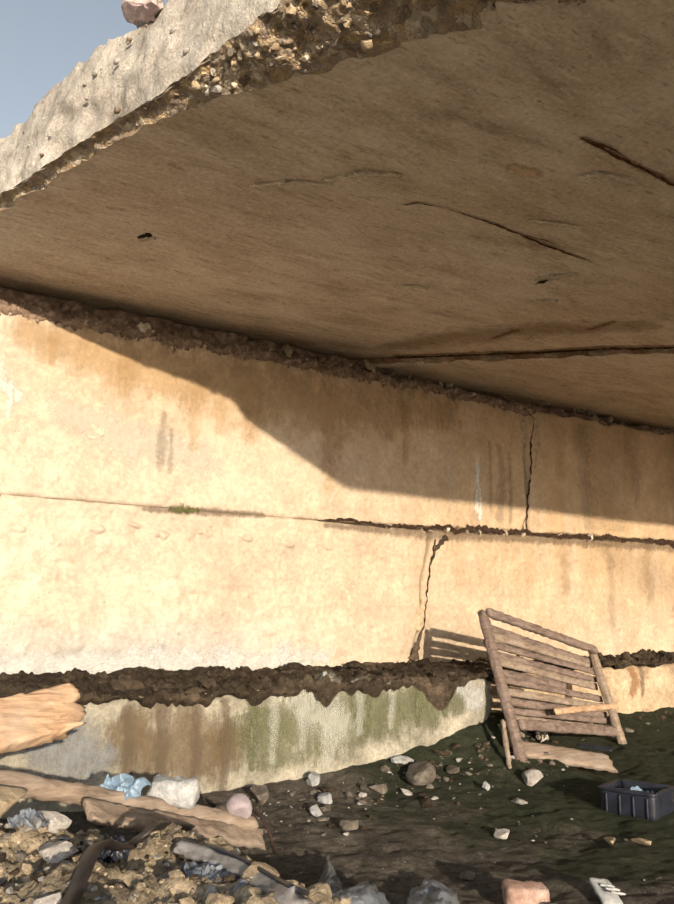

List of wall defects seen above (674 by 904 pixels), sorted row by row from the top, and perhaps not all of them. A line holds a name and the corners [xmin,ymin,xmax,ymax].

spalling [0,0,537,211]
crack [580,137,674,186]
spalling [137,233,156,243]
crack [395,202,596,264]
leakage [0,361,22,418]
leakage [474,465,482,520]
crack [520,413,542,529]
crack [408,535,449,661]
leakage [23,705,258,783]
leakage [291,692,351,746]